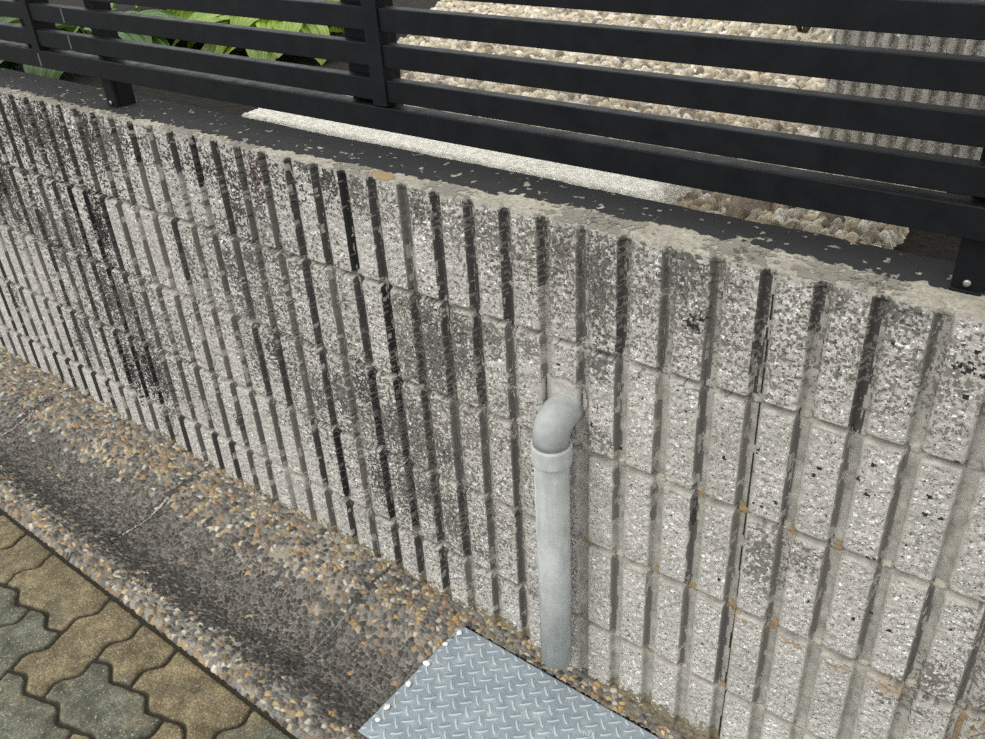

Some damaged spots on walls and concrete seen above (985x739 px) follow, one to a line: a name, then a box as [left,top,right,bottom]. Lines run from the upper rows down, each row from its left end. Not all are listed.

damp [0,85,985,647]
damp [0,395,380,739]
damp [677,483,699,668]
damp [714,394,835,712]
damp [857,445,911,666]
damp [874,575,985,739]